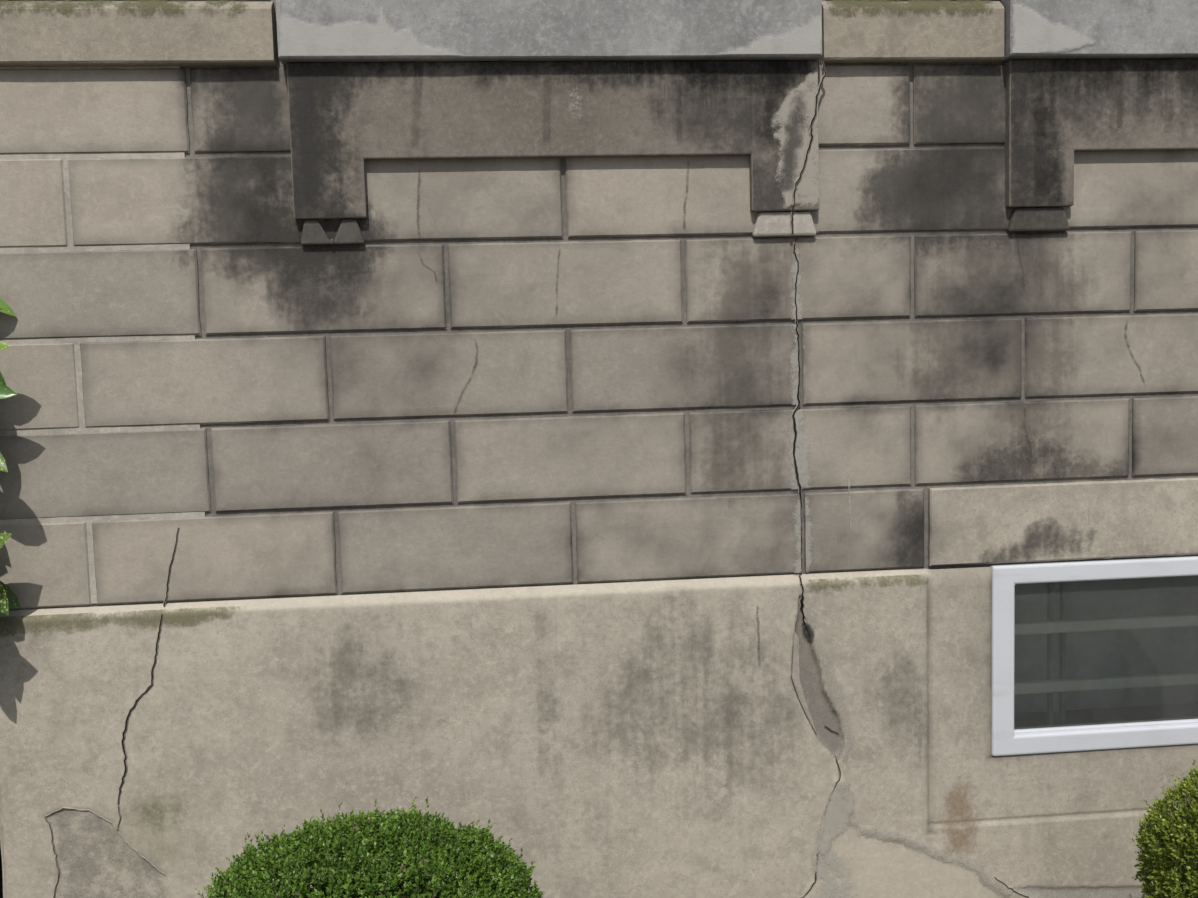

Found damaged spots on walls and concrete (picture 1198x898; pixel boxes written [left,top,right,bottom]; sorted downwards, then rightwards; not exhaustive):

peeling [720,16,822,54]
water stain [204,68,384,268]
peeling [773,69,819,207]
water stain [898,68,1062,205]
crack [790,61,827,625]
crack [44,528,180,898]
spalling [792,604,842,759]
crack [824,756,841,814]
crack [798,851,819,898]
crack [995,877,1031,898]